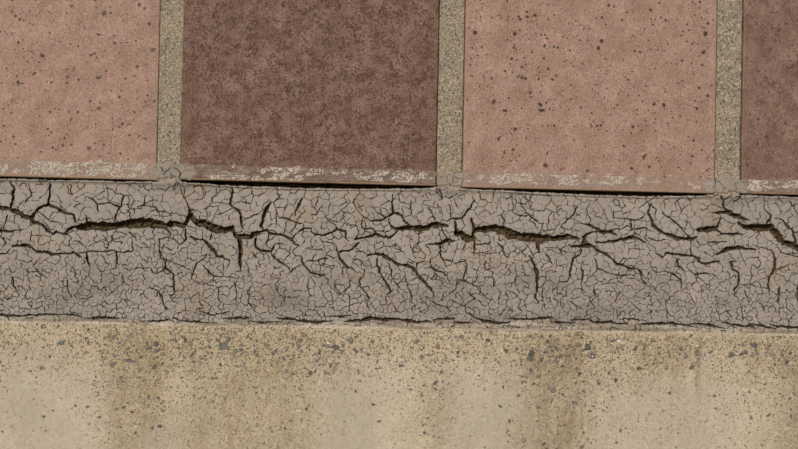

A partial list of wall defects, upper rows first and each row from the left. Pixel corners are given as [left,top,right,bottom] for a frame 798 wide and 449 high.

peeling [0,158,156,179]
peeling [191,164,433,183]
peeling [463,170,671,191]
peeling [746,179,798,192]
crack [0,163,798,335]